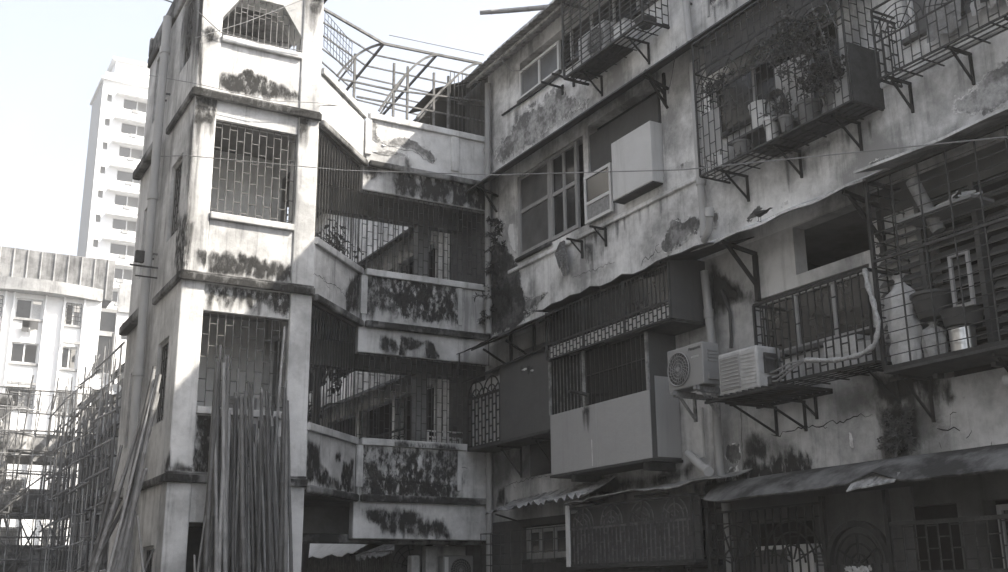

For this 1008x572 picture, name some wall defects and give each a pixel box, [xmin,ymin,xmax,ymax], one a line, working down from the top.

damp [174,0,319,314]
peeling [494,86,590,164]
peeling [951,58,1008,117]
peeling [661,216,700,254]
damp [346,273,486,359]
crack [771,413,872,437]
mould [291,441,480,539]